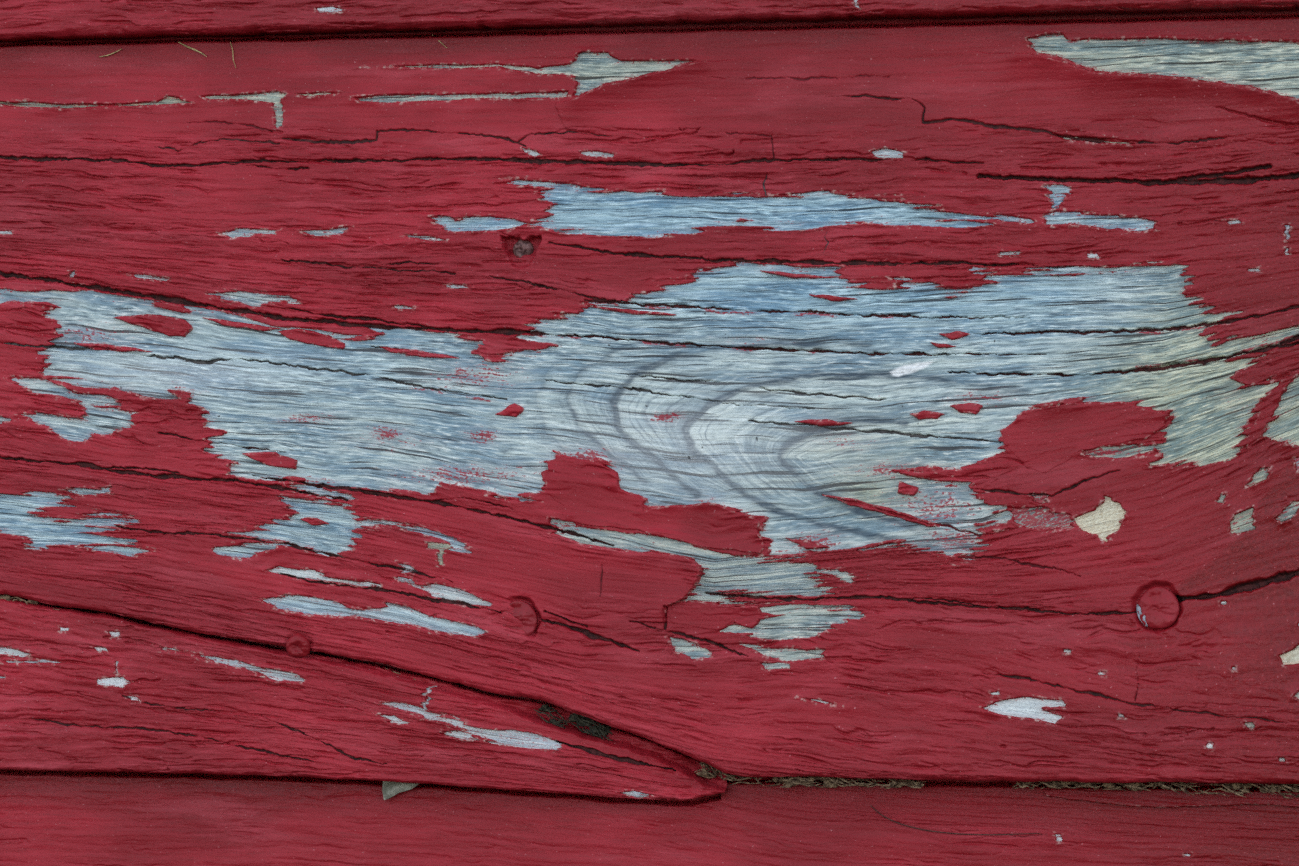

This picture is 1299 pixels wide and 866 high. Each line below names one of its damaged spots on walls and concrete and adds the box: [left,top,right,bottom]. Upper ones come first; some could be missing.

crack [743,75,1107,143]
peeling [967,34,1299,157]
crack [0,121,1299,196]
peeling [409,181,1155,241]
crack [549,233,1074,268]
peeling [0,252,1299,669]
crack [1176,570,1299,602]
crack [542,611,747,656]
peeling [202,655,304,682]
crack [35,695,387,765]
peeling [380,686,562,750]
peeling [984,692,1066,723]